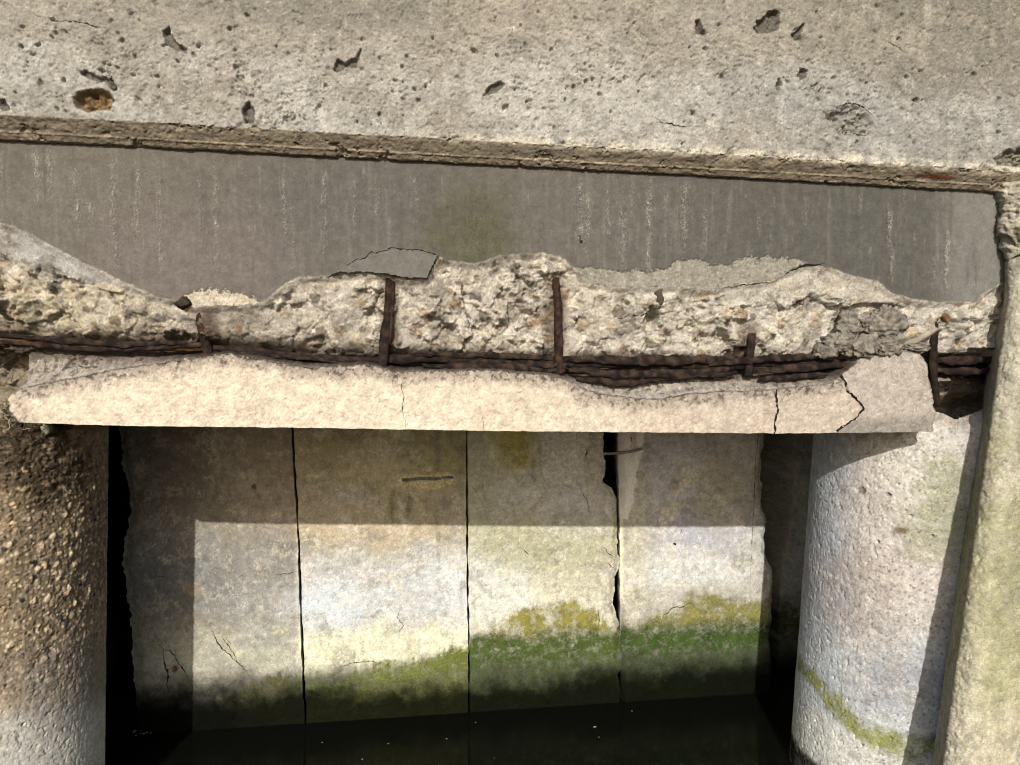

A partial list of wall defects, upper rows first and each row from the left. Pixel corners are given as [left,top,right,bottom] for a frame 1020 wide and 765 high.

spalling [0,223,1004,733]
crack [750,390,779,578]
crack [836,375,865,432]